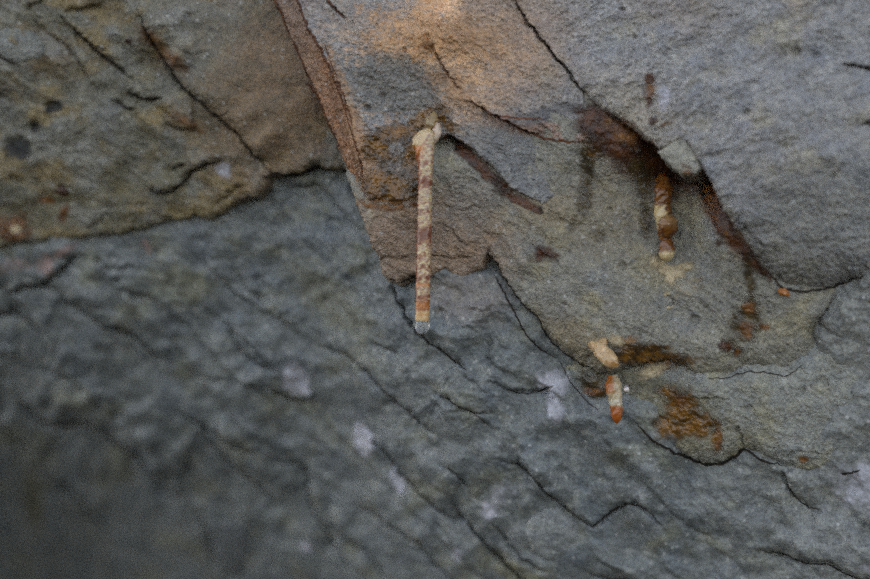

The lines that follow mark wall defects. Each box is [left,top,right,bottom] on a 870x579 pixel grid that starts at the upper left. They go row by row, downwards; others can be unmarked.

crack [515,0,584,94]
crack [433,46,588,143]
crack [152,161,216,193]
leakage [572,145,602,224]
leakage [629,158,653,237]
leakage [650,255,693,309]
leakage [609,335,691,379]